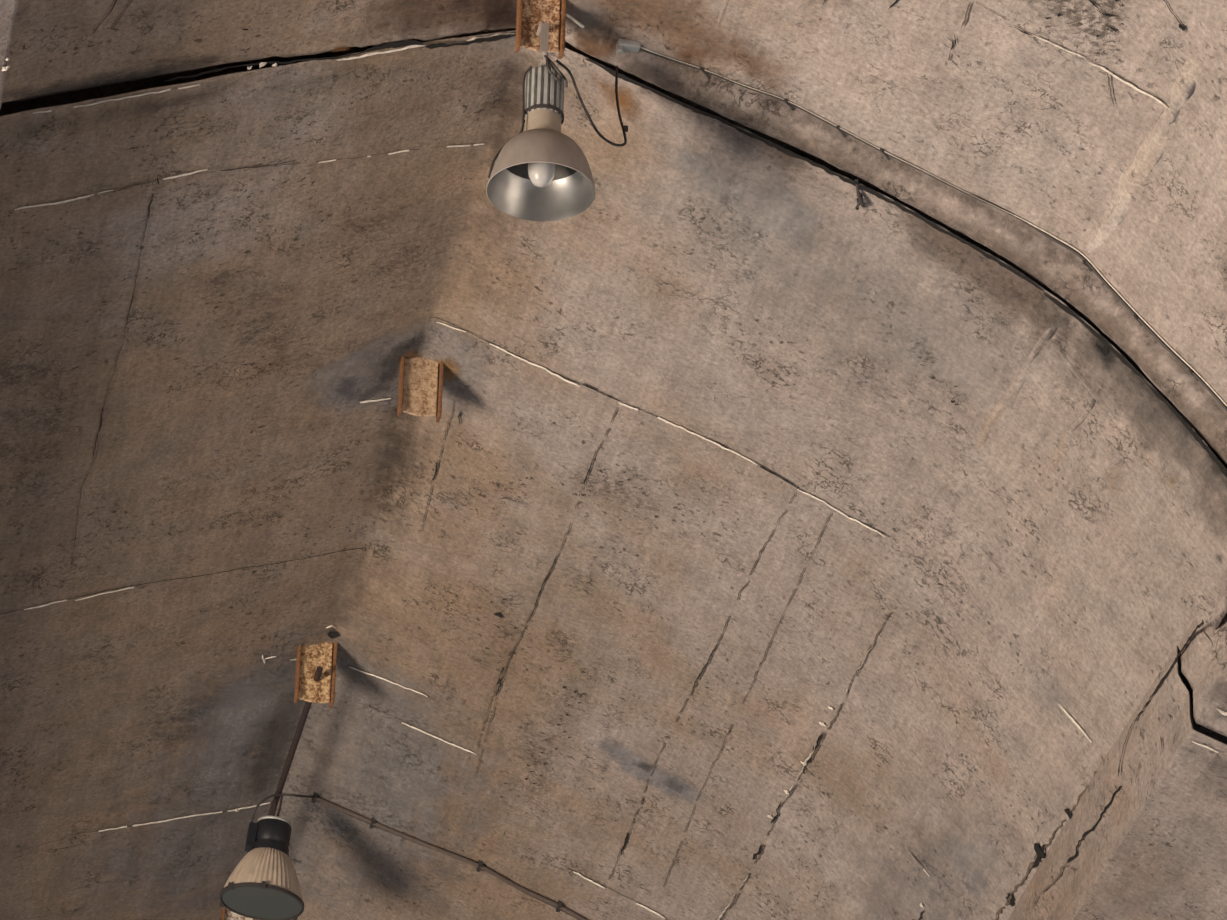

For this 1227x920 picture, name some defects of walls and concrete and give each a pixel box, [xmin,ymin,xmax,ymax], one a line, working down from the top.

crack [84,34,516,86]
leakage [624,63,682,92]
leakage [698,97,876,180]
leakage [324,328,478,406]
leakage [975,233,1227,490]
crack [349,317,897,920]
leakage [115,656,439,897]
crack [995,619,1226,920]
crack [910,852,930,920]